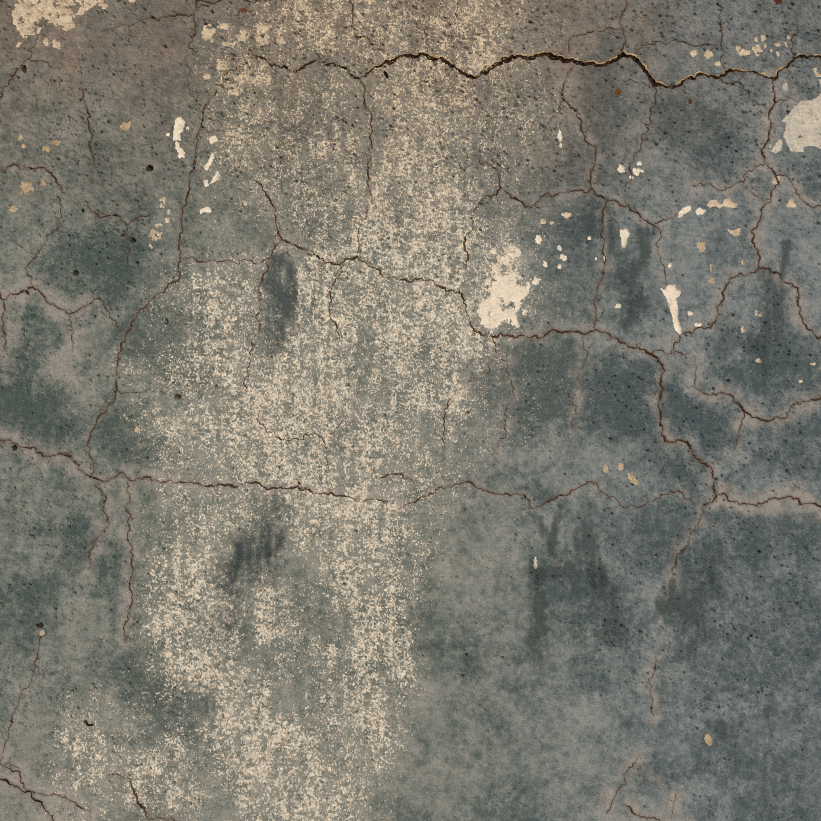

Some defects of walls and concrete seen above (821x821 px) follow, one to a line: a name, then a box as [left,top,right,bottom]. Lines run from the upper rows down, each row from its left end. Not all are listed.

peeling [12,0,136,49]
peeling [769,68,821,153]
crack [0,0,821,642]
peeling [477,247,541,329]
peeling [661,285,682,336]
leakage [34,0,576,821]
crack [0,635,90,821]
crack [111,773,175,821]
crack [606,763,676,821]